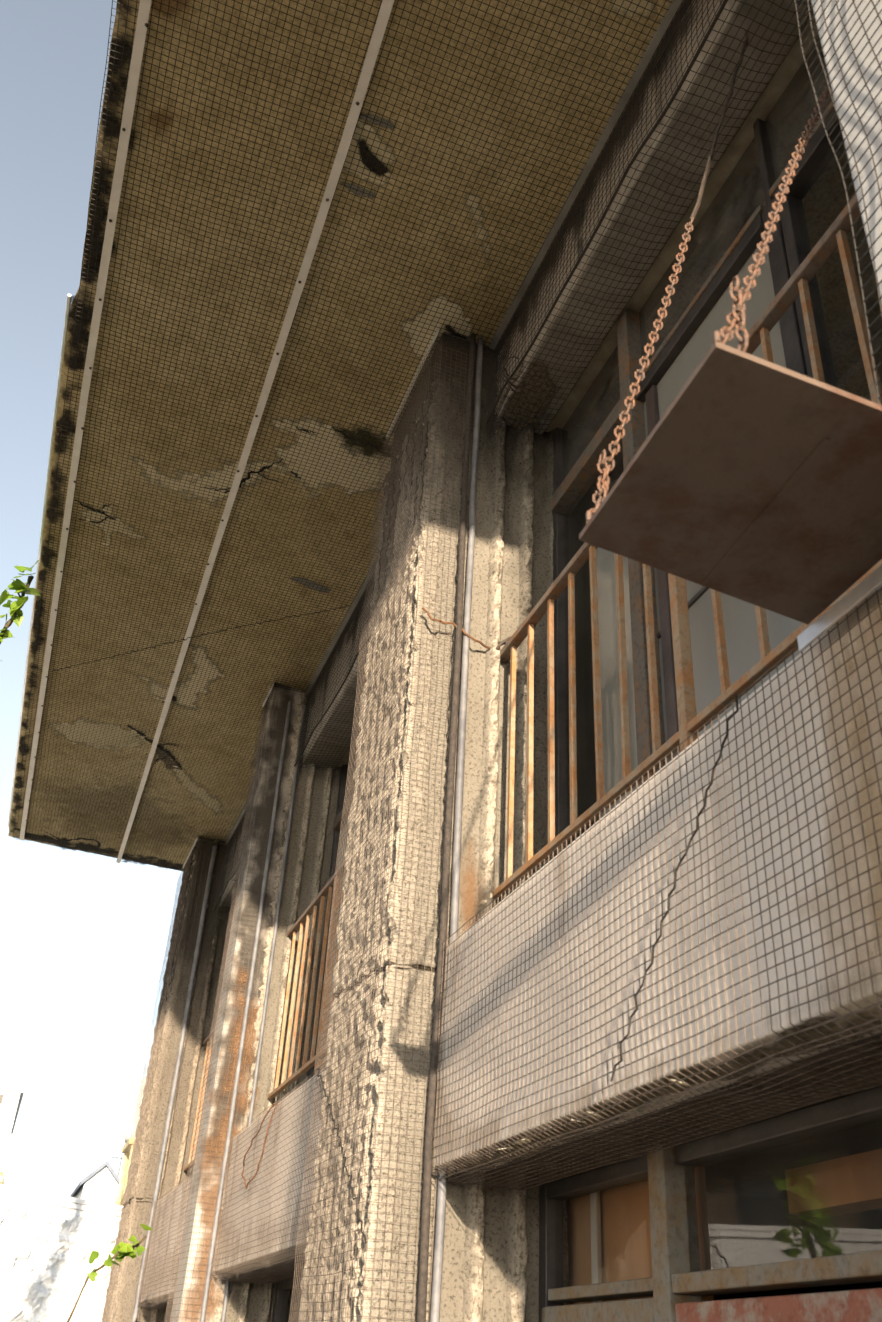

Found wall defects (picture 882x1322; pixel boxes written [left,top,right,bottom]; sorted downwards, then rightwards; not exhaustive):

water stain [611,0,653,17]
spalling [342,113,396,199]
water stain [373,10,691,591]
peeling [134,415,395,505]
crack [76,500,116,523]
crack [128,726,182,770]
water stain [10,430,295,1161]
crack [333,927,437,1021]